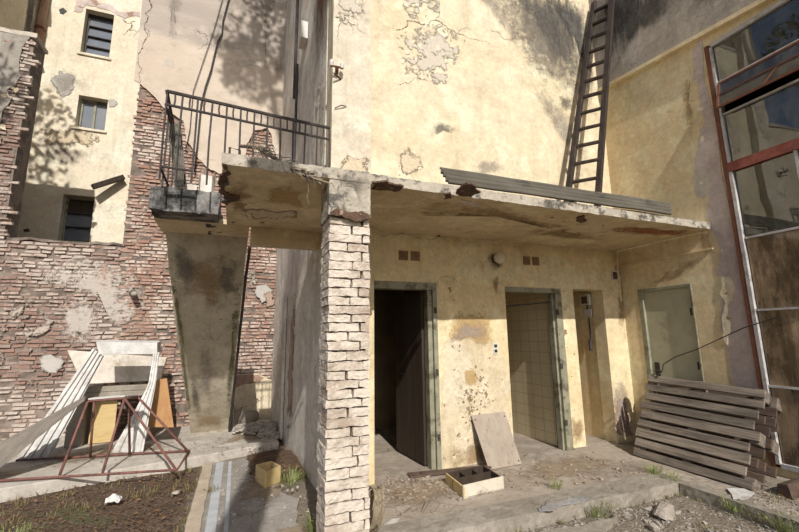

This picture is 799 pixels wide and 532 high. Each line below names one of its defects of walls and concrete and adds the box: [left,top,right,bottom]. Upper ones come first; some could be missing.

peeling [74,0,140,18]
crack [122,0,152,82]
peeling [396,0,465,84]
leakage [485,0,585,85]
leakage [605,0,667,50]
peeling [341,156,369,172]
peeling [371,147,424,192]
corrosion [615,227,687,236]
leakage [465,370,476,385]